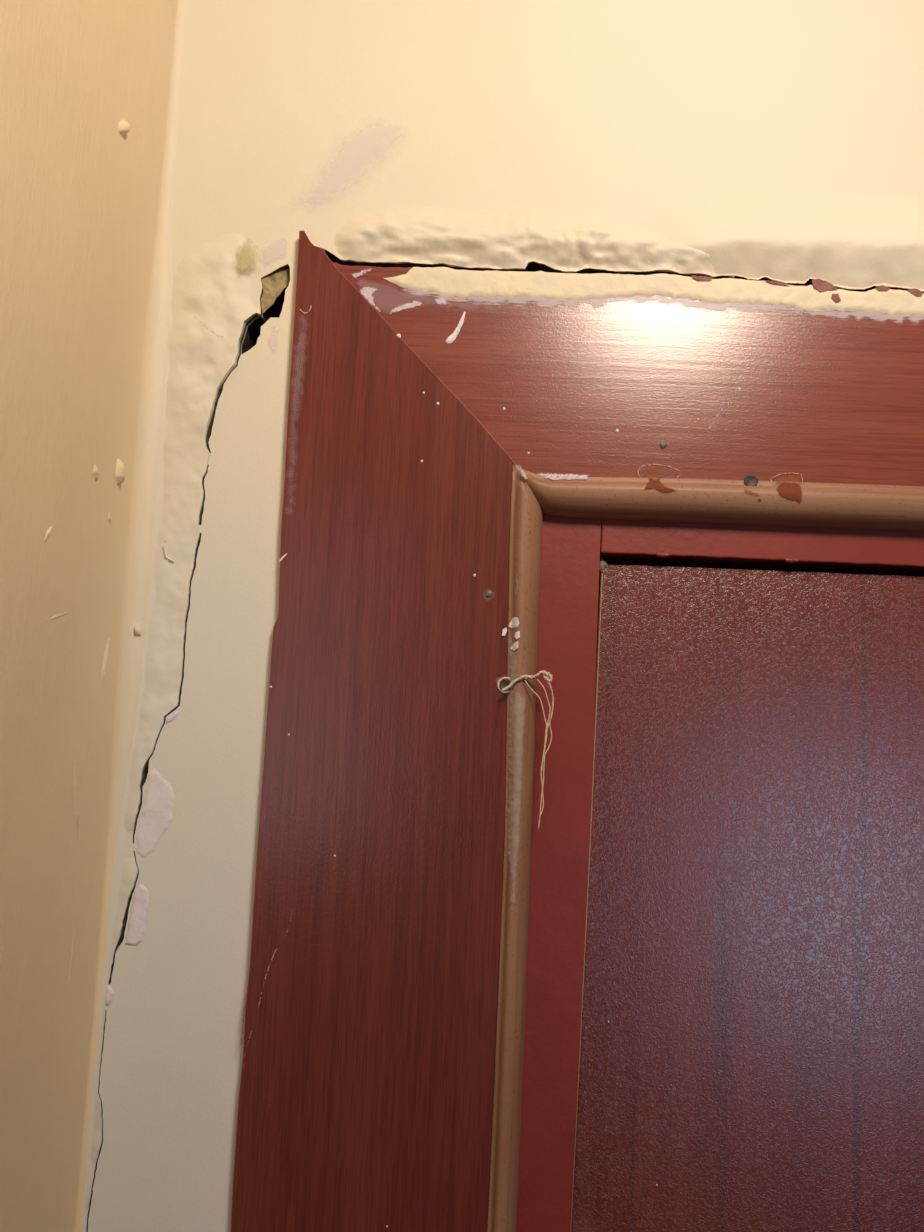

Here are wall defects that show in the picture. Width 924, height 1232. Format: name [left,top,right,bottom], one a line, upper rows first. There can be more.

crack [323,249,924,293]
crack [109,355,240,984]
peeling [136,767,176,858]
peeling [125,884,150,946]
crack [87,1017,106,1232]